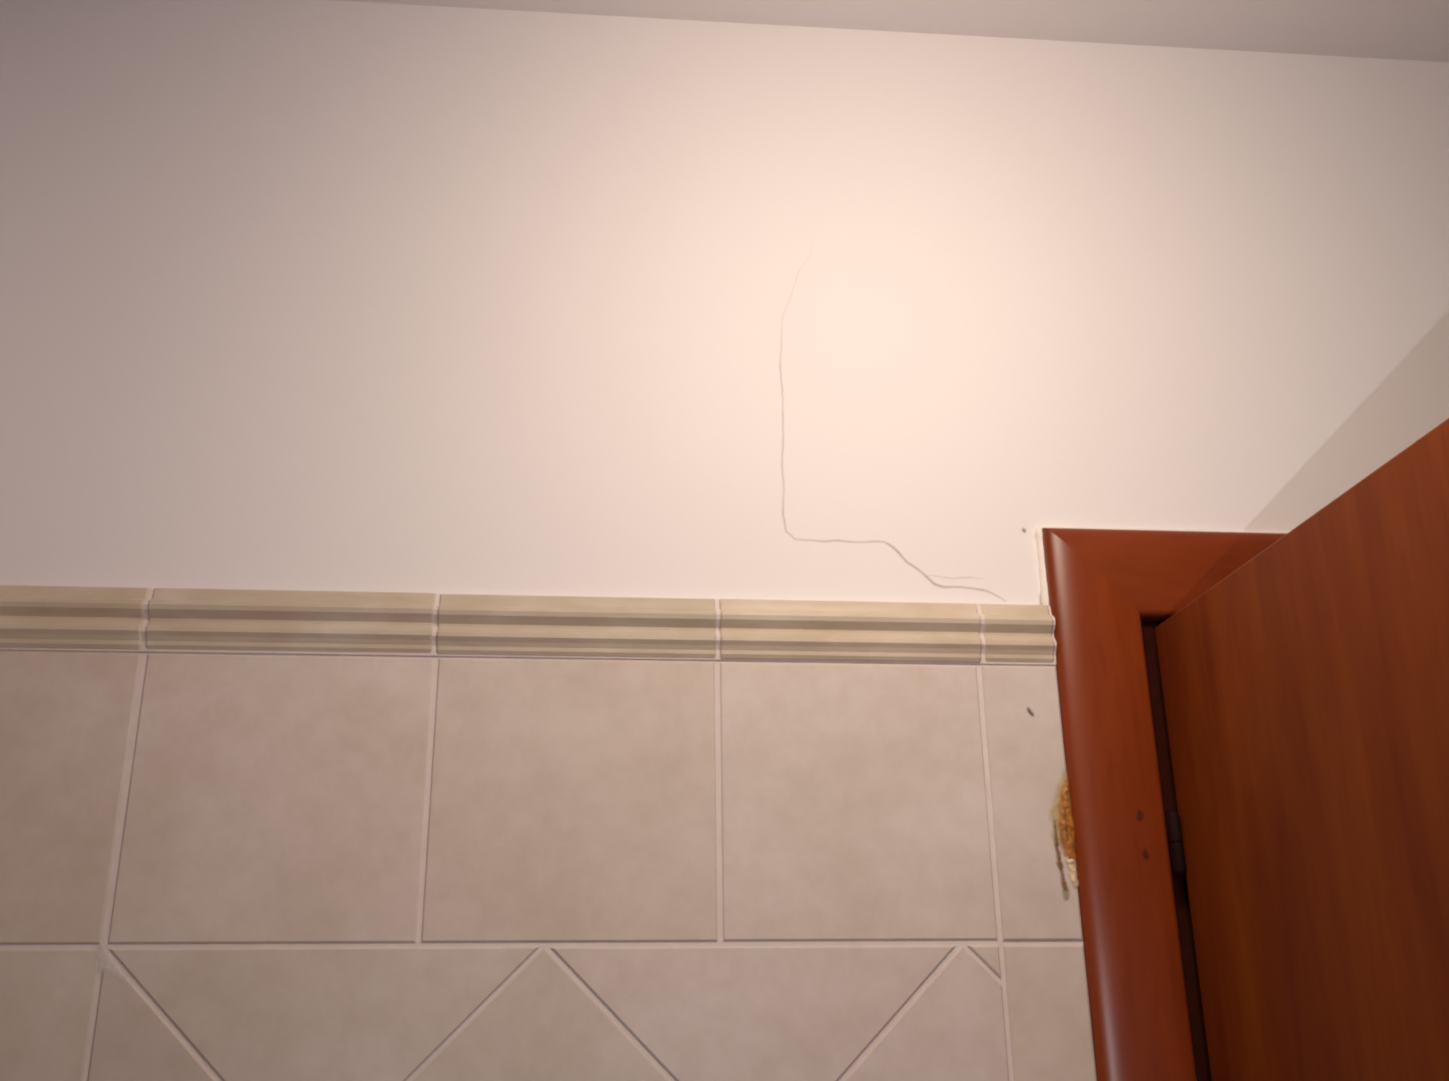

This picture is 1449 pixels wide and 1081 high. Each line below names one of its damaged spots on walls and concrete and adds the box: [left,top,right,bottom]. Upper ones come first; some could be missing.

peeling [1066,857,1078,886]